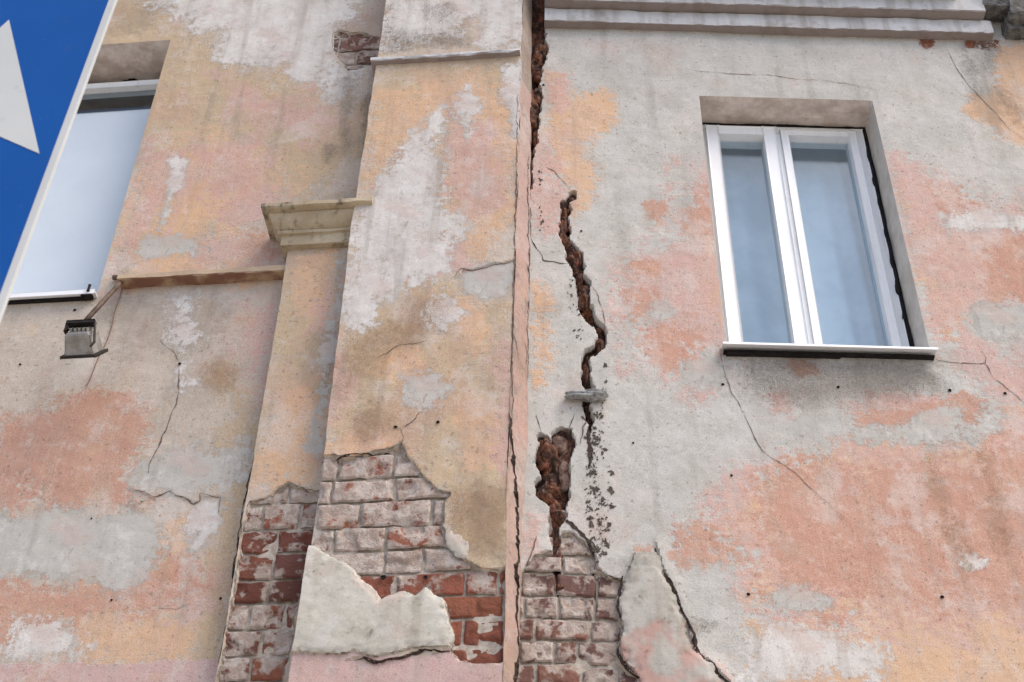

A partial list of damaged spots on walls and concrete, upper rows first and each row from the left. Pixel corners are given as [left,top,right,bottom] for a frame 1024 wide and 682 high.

peeling [130,0,523,140]
crack [137,336,254,661]
flaking render [217,83,514,682]
crack [455,0,640,682]
crack [720,354,839,513]
flaking render [517,510,637,682]
crack [654,548,729,682]